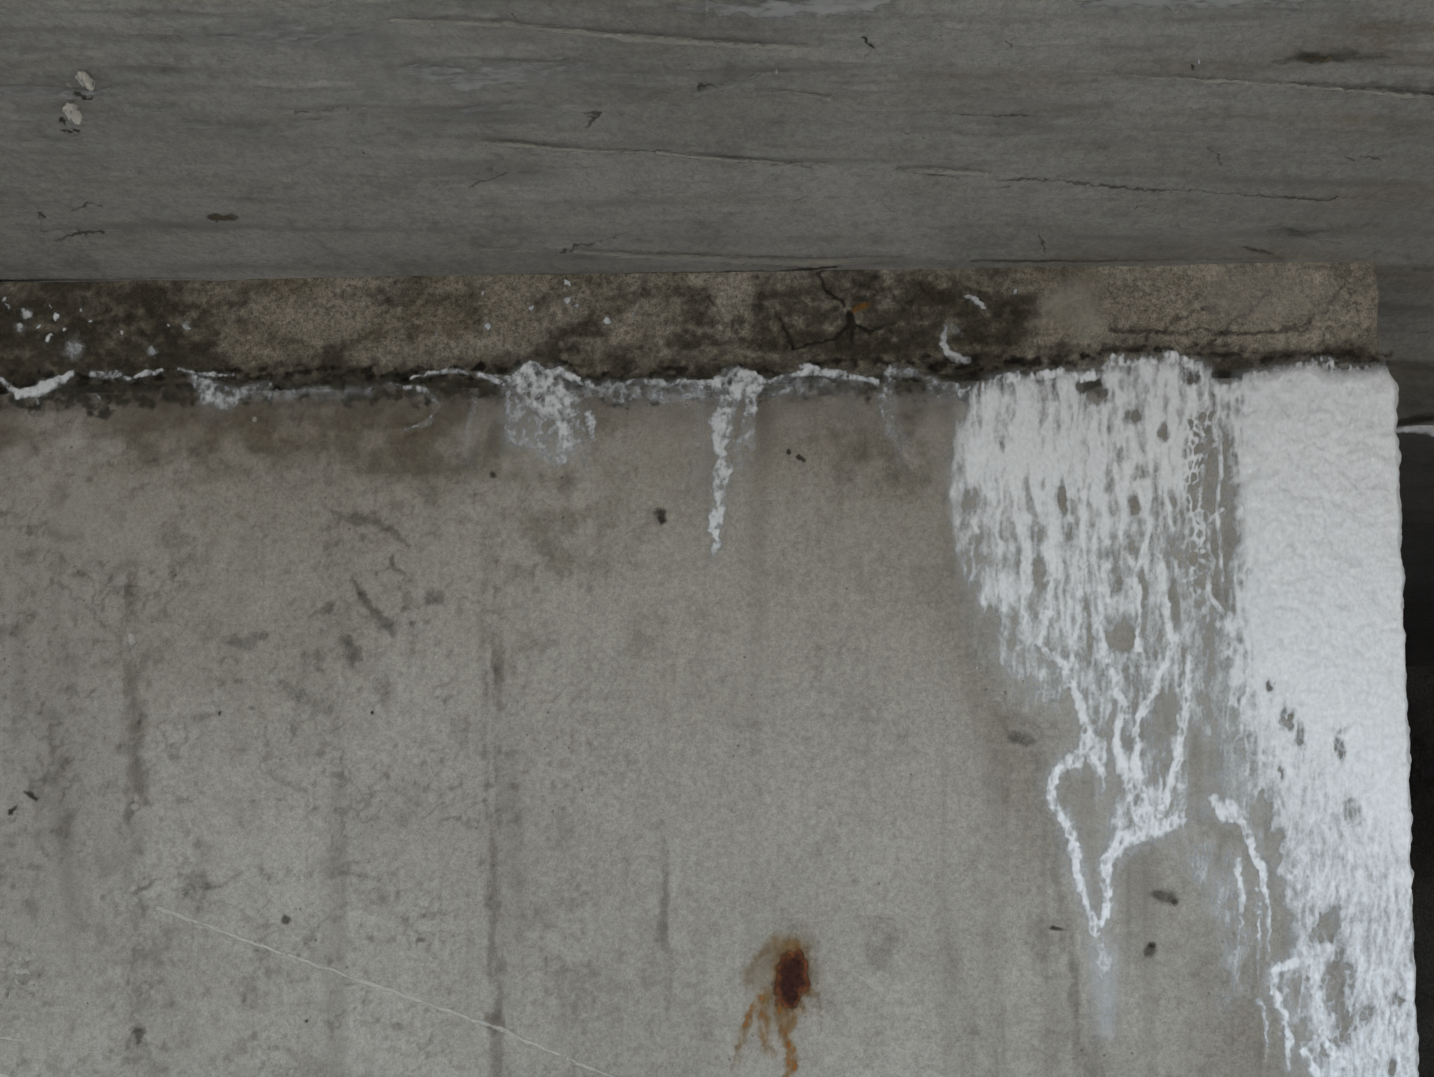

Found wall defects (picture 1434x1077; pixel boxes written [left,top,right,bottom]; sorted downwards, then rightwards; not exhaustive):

crack [1000,178,1164,191]
crack [0,266,1392,390]
damp [940,327,971,363]
damp [395,361,913,554]
crack [1396,415,1434,428]
damp [934,351,1434,1077]
corrosion [735,940,811,1077]